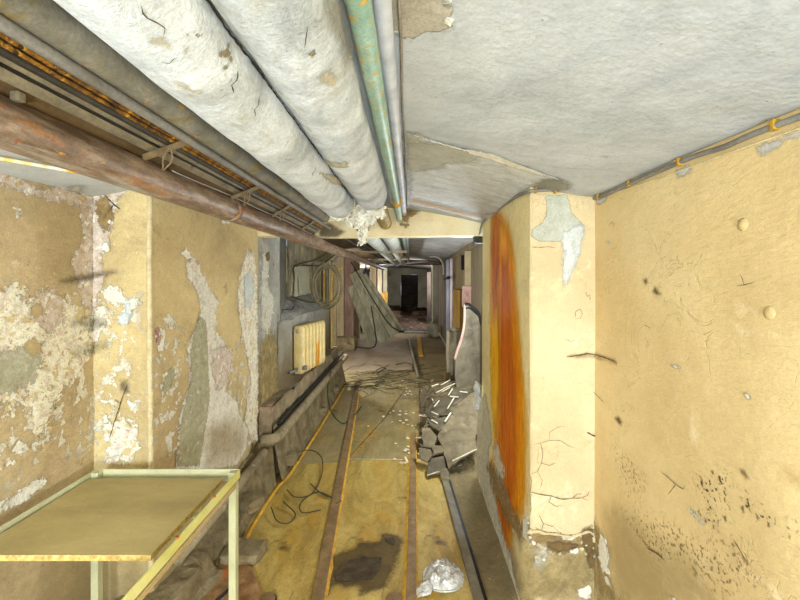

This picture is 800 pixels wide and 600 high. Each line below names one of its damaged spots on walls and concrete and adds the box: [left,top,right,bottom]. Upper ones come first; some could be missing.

peeling [392,0,454,39]
peeling [531,194,585,289]
peeling [0,173,143,472]
peeling [153,246,275,469]
rust [490,213,526,550]
peeling [0,477,47,514]
spalling [486,445,610,586]
crack [530,426,589,535]
peeling [578,585,592,599]